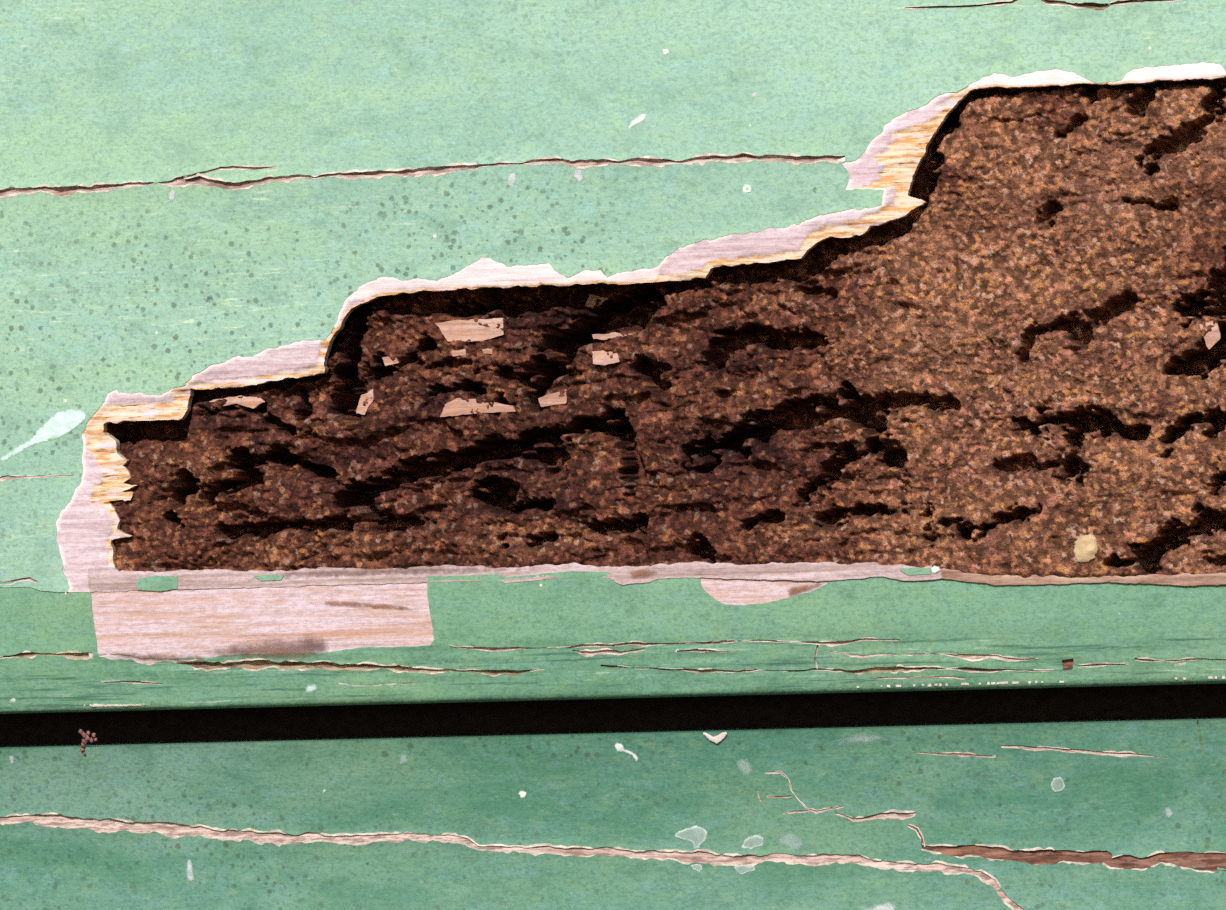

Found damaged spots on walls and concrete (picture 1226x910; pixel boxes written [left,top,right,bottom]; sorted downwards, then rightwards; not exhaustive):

crack [905,0,1181,11]
crack [0,152,845,198]
peeling [55,62,1226,663]
crack [0,637,1226,686]
crack [0,771,1226,910]